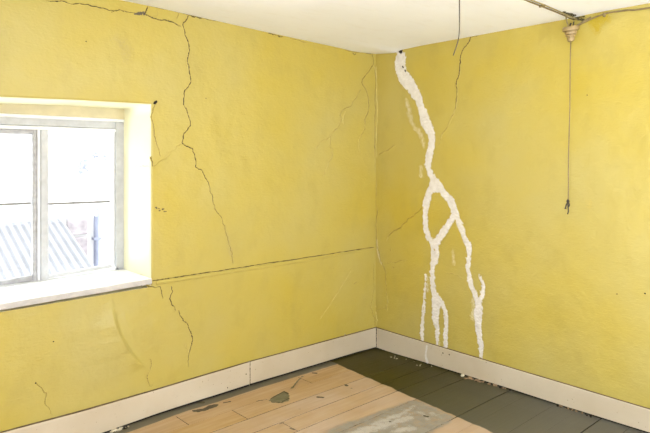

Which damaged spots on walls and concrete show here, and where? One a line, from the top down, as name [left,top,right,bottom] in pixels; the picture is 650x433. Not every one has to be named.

crack [46,0,422,367]
crack [403,35,479,146]